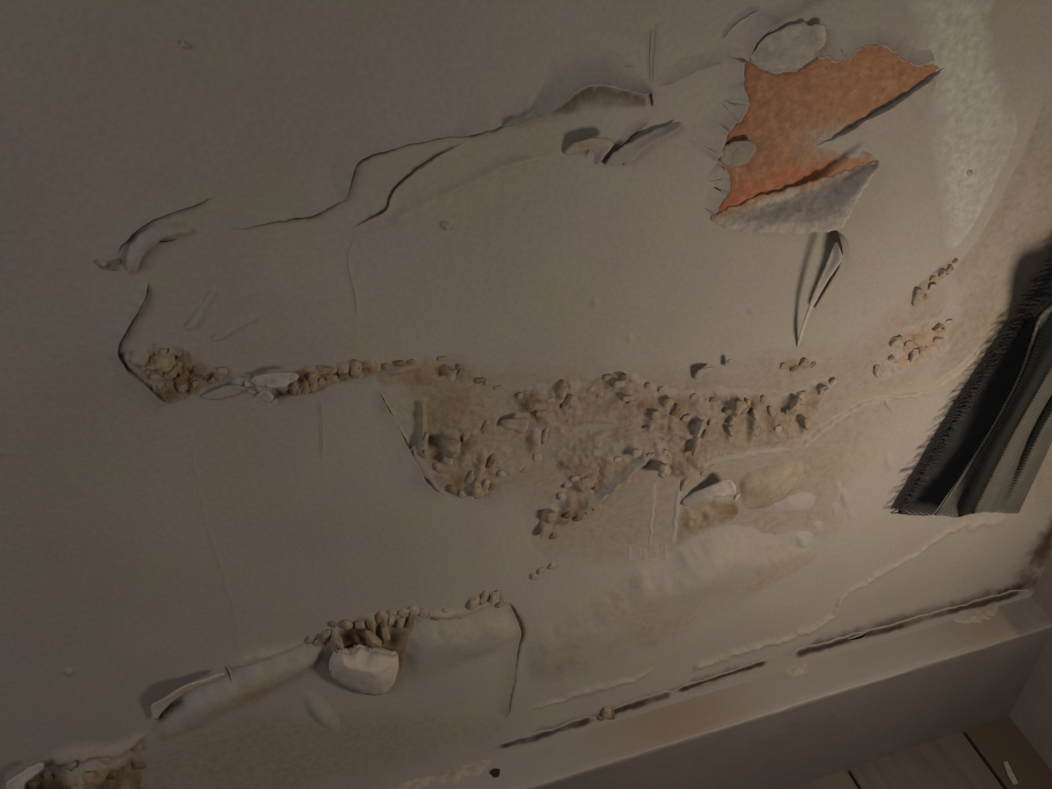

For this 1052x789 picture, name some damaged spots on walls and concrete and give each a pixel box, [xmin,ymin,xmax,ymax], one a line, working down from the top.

peeling [96,21,958,546]
crack [494,589,1029,749]
flaking render [1,730,151,789]